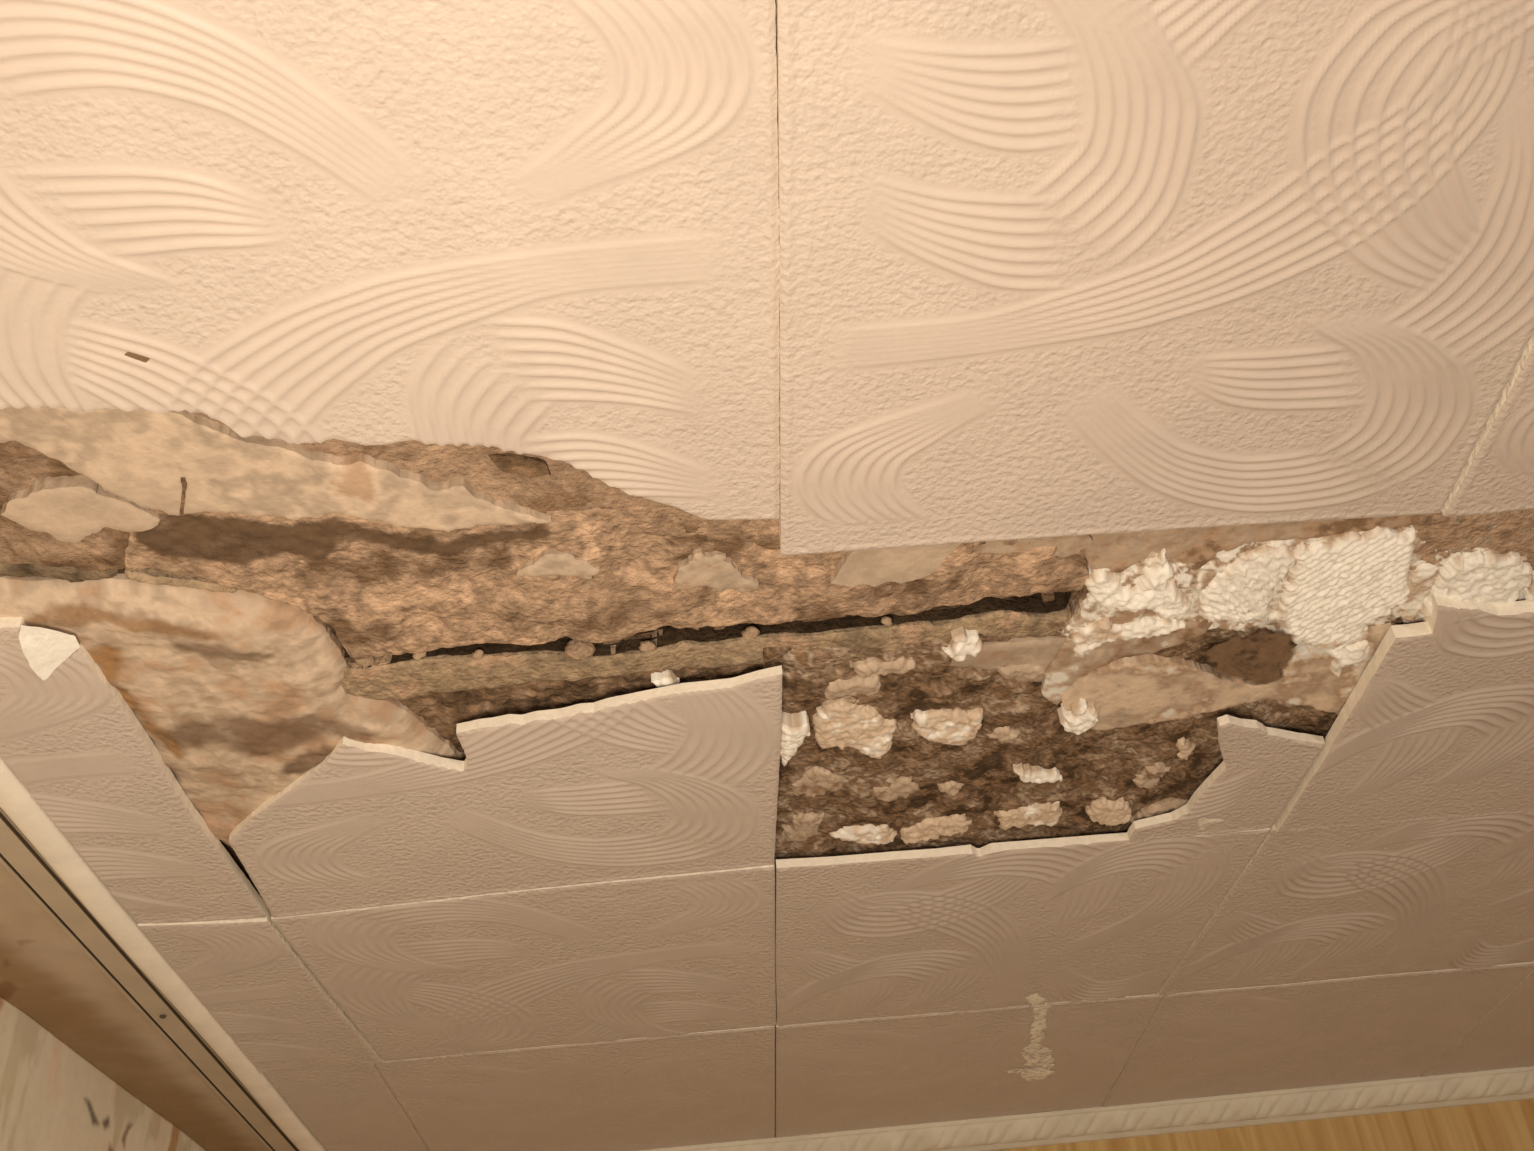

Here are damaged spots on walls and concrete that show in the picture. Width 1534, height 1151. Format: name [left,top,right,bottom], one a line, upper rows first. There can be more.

leakage [137,515,551,566]
crack [0,563,237,593]
crack [326,591,1072,669]
spalling [0,406,1534,888]
leakage [285,749,332,774]